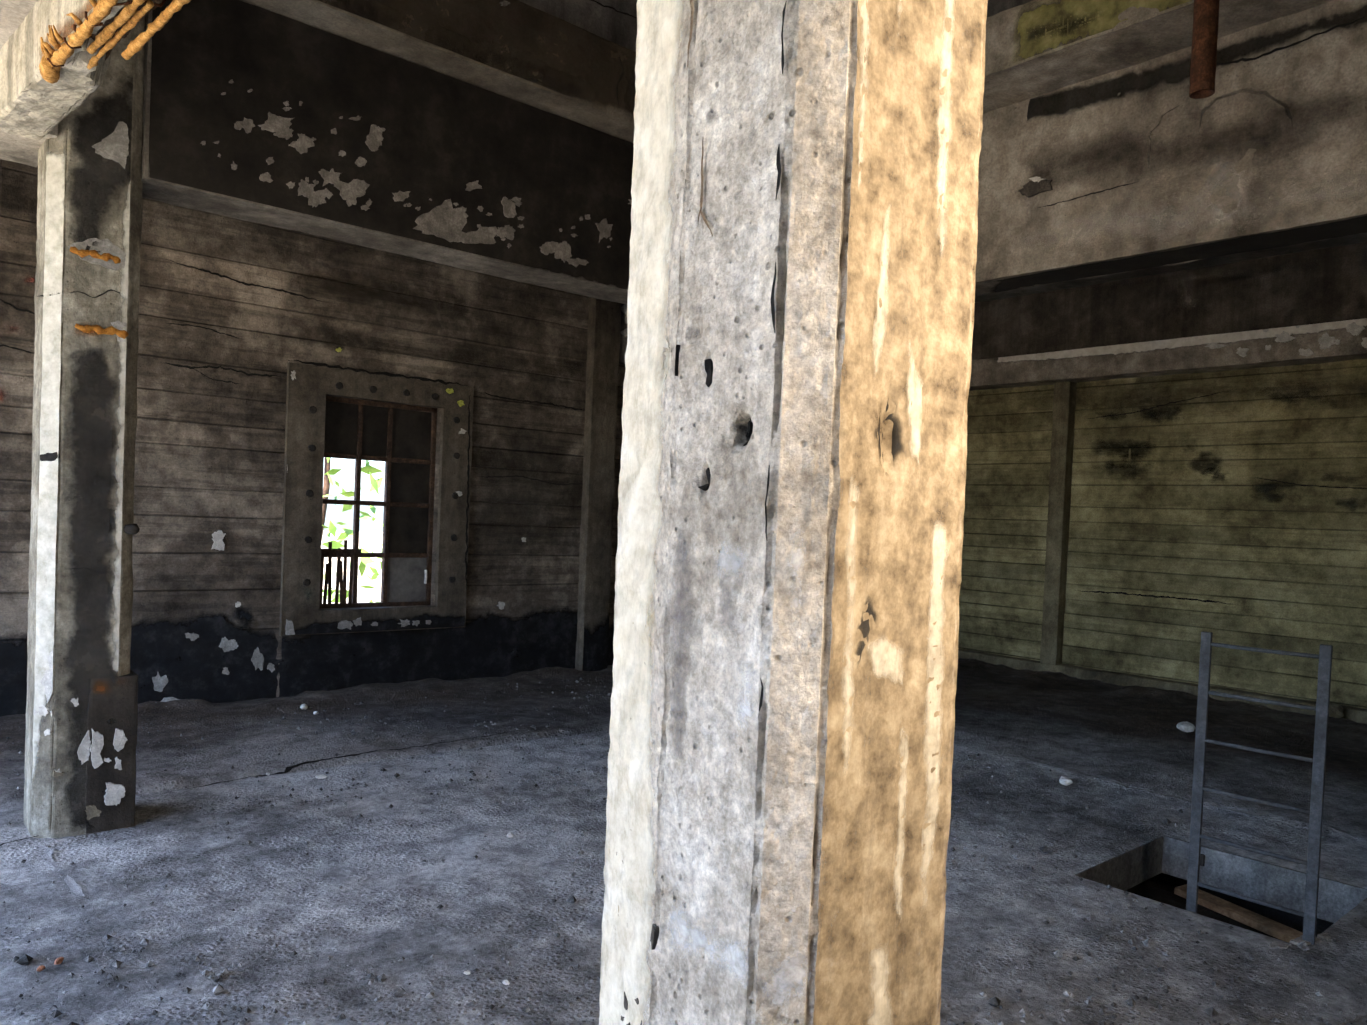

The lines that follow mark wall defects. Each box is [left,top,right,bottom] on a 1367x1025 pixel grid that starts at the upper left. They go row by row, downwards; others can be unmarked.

corrosion [40,0,97,59]
leakage [1016,0,1192,60]
spalling [92,122,129,169]
peeling [234,101,386,211]
peeling [392,180,524,248]
leakage [997,318,1367,362]
leakage [0,77,582,827]
leakage [1188,440,1224,479]
leakage [774,0,988,1025]
peeling [219,637,275,675]
peeling [152,672,180,702]
peeling [77,728,127,820]